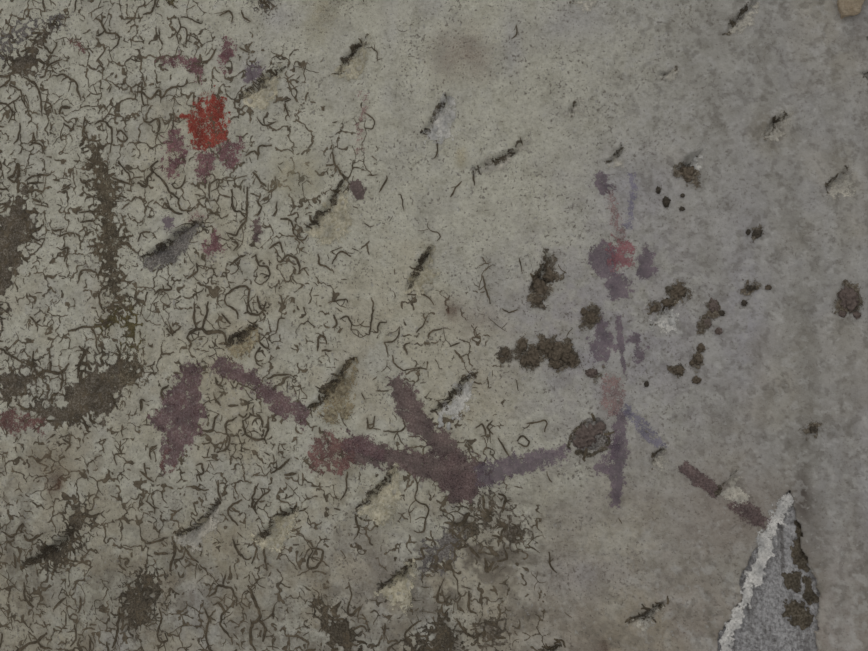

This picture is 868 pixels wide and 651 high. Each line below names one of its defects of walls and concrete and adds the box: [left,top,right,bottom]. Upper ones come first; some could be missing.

crack [95,0,270,49]
spalling [722,2,760,40]
crack [0,42,358,391]
crack [326,152,404,208]
spalling [825,166,857,203]
crack [317,288,460,371]
crack [191,377,296,571]
crack [468,419,548,456]
crack [408,477,429,561]
crack [0,523,121,651]
crack [204,574,275,651]
flaking render [717,490,820,651]